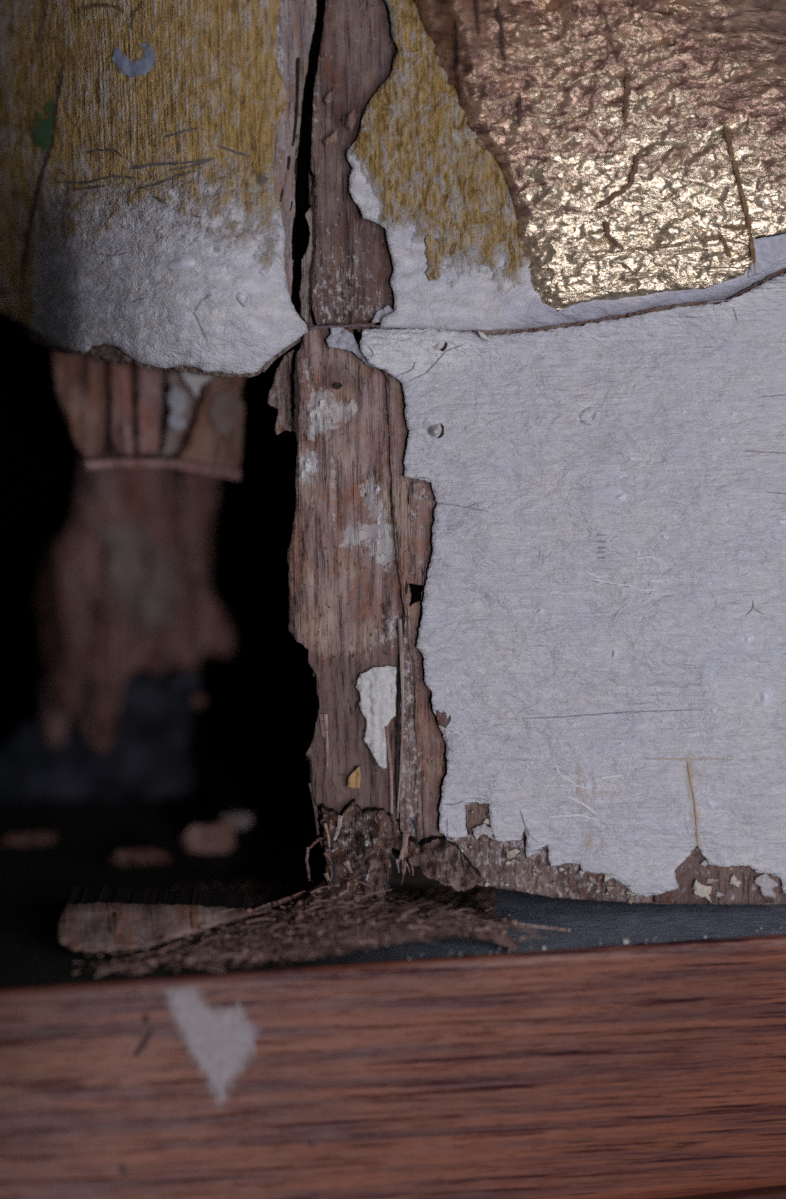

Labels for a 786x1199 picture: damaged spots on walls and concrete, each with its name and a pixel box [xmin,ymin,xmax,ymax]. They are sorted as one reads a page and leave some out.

crack [22,0,66,291]
crack [81,2,143,30]
crack [385,0,395,40]
spalling [0,0,786,906]